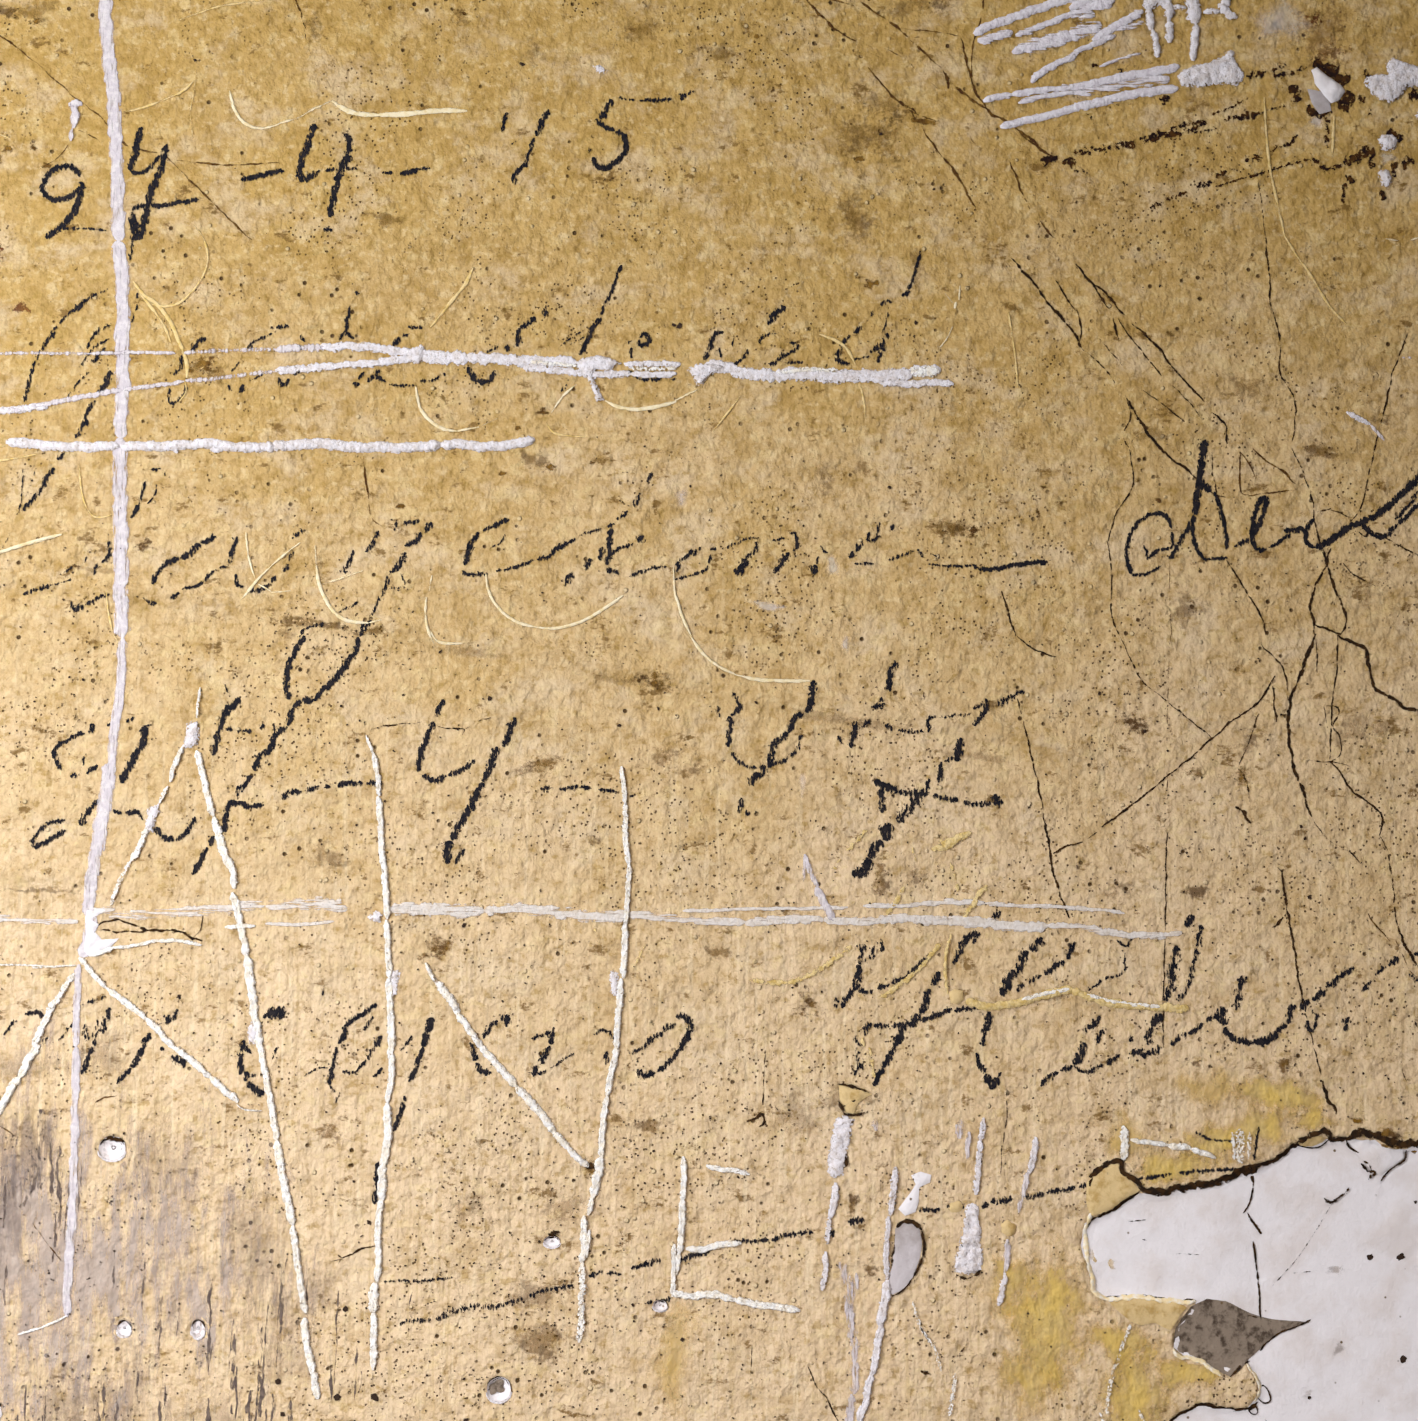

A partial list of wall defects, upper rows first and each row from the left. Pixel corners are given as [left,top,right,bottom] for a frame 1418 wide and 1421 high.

crack [807,0,1058,237]
crack [1001,591,1056,657]
crack [1012,182,1418,1045]
crack [1274,868,1337,1113]
peeling [1081,1127,1418,1421]